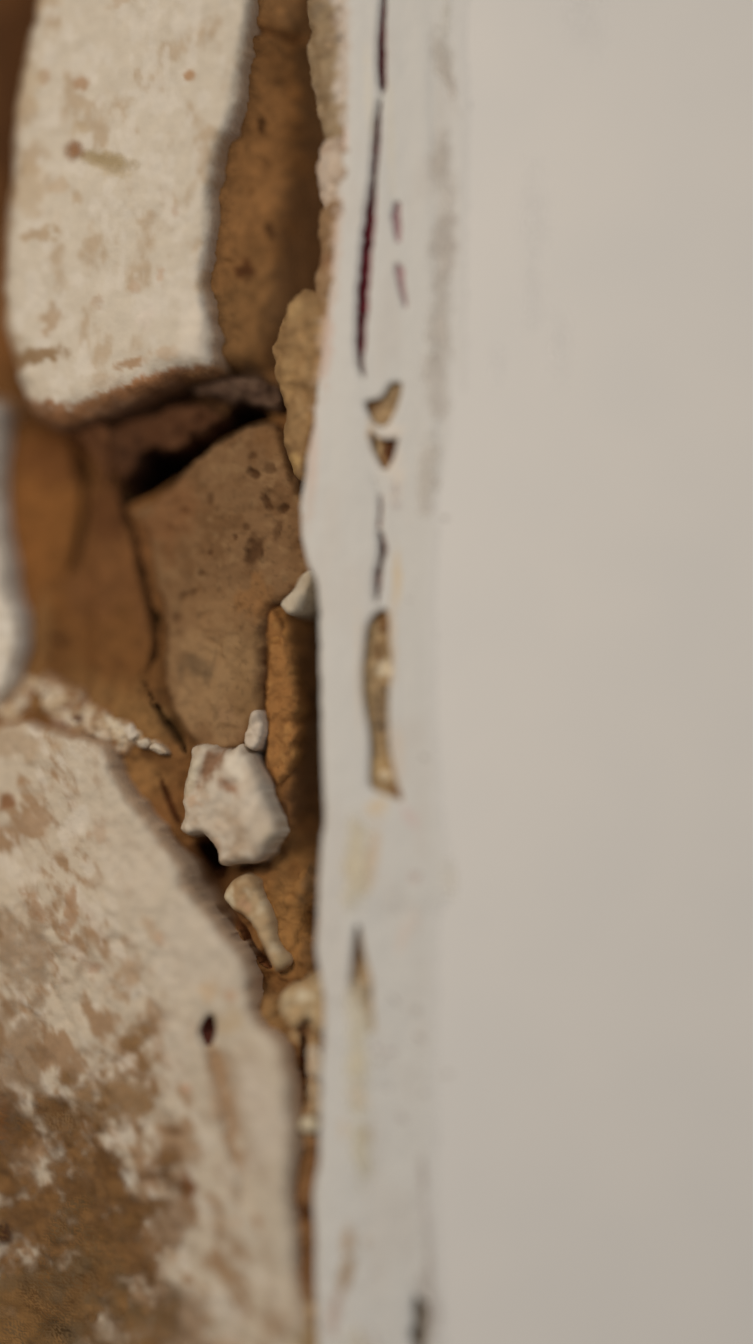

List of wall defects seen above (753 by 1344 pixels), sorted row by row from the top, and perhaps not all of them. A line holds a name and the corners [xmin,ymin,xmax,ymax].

crack [357,0,407,377]
crack [245,413,272,426]
crack [69,445,90,576]
crack [120,458,193,665]
crack [154,704,187,753]
flaking render [0,0,471,1344]
crack [159,774,181,825]
crack [216,873,272,969]